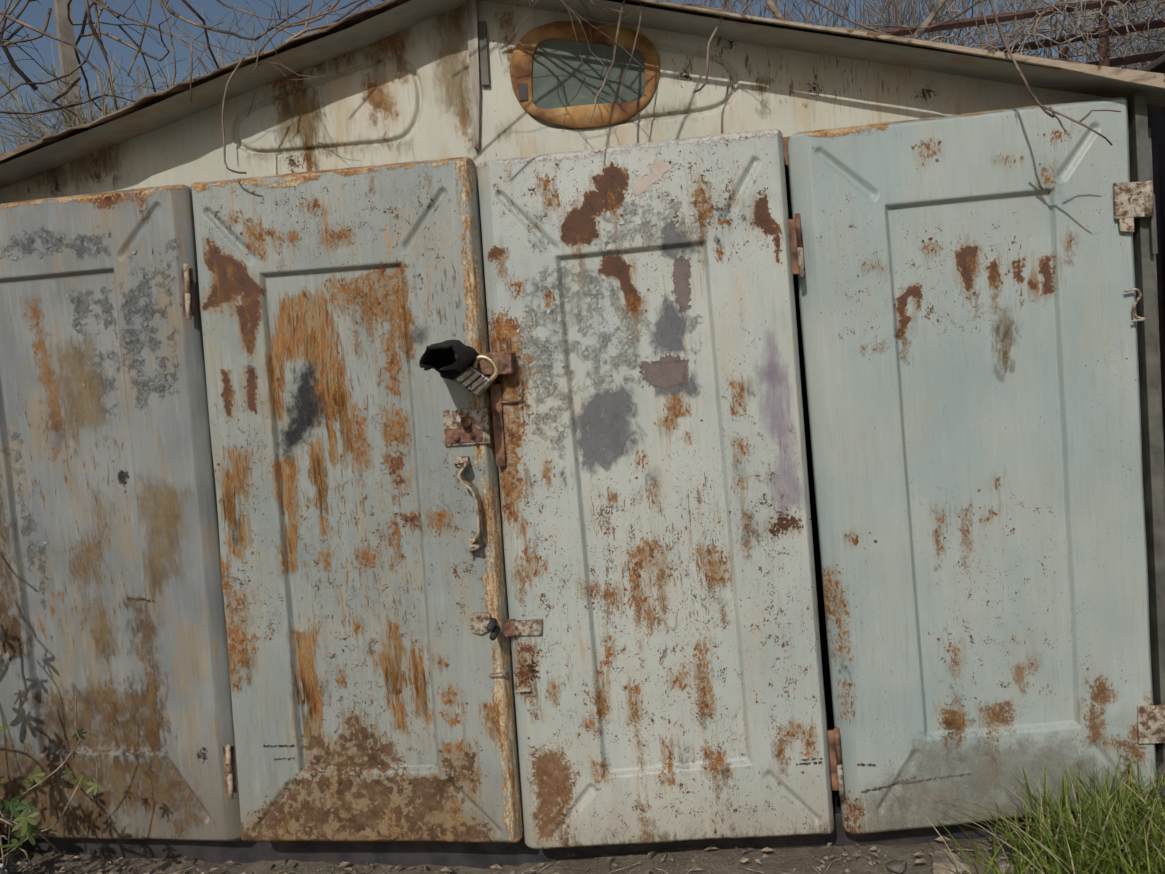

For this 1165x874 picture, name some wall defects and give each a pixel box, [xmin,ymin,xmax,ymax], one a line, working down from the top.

rust [672,40,869,105]
rust [911,138,942,165]
rust [799,101,1077,149]
peeling [1,228,111,260]
peeling [66,239,182,415]
peeling [516,161,703,458]
rust [897,214,1025,344]
rust [0,64,819,848]
rust [822,564,854,661]
rust [921,488,1066,787]
rust [837,679,855,725]
rust [842,790,867,835]